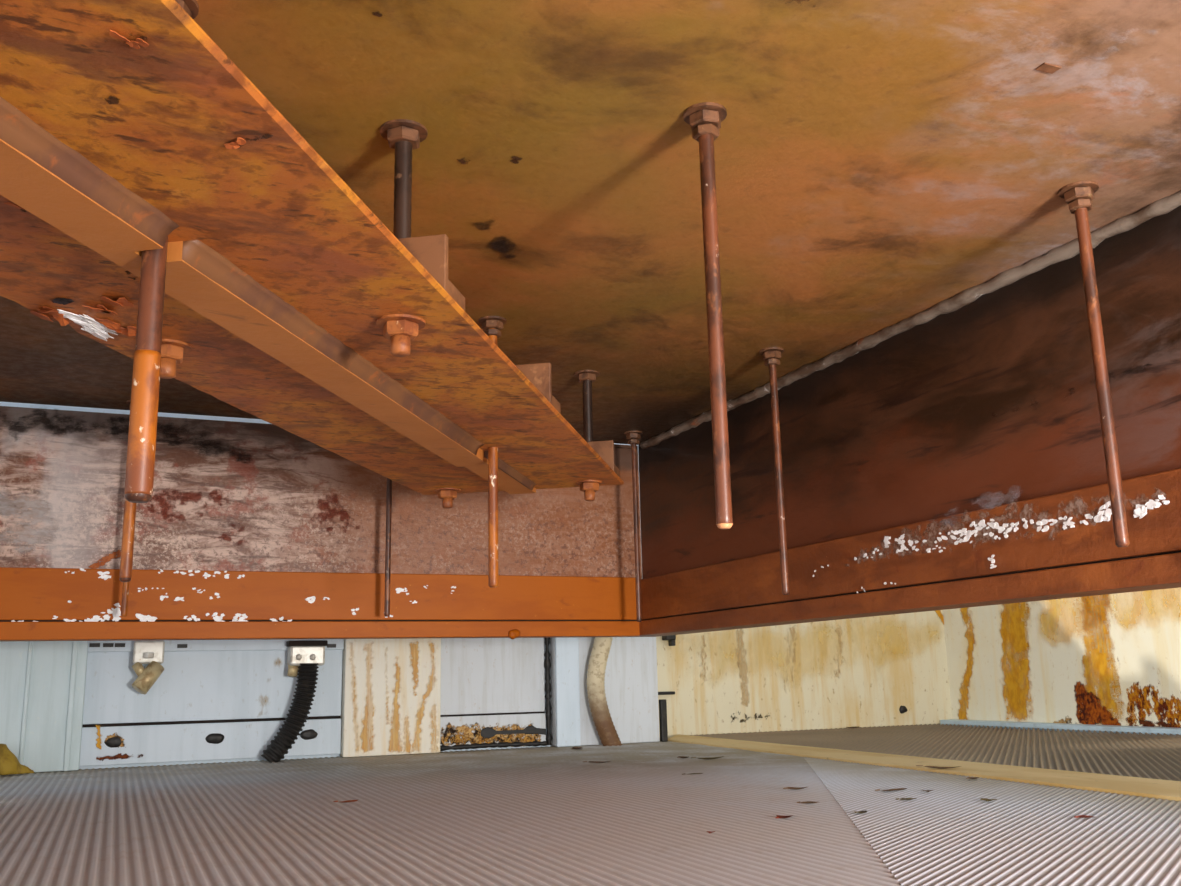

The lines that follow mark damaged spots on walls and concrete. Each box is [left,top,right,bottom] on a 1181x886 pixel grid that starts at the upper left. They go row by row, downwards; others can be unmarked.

corrosion [475,223,515,258]
peeling [30,296,137,341]
damp [8,410,129,435]
damp [156,423,251,463]
peeling [848,489,1170,569]
peeling [52,603,121,622]
peeling [135,569,248,622]
corrosion [1000,594,1181,728]
corrosion [389,641,546,753]
corrosion [354,697,373,752]